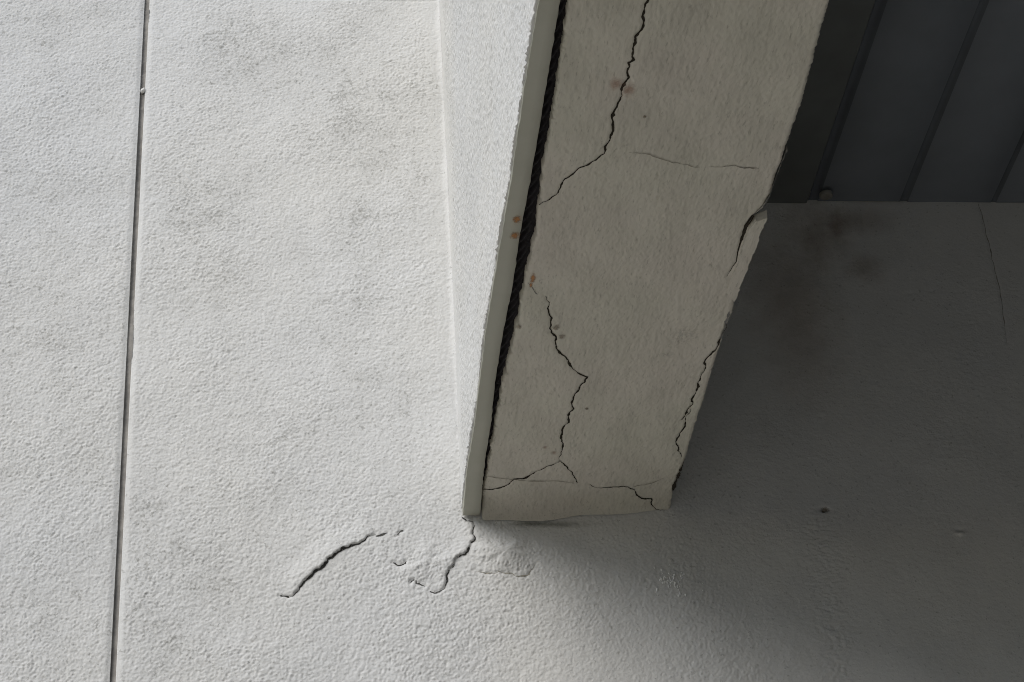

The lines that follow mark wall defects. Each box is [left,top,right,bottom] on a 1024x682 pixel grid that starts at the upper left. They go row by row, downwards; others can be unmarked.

crack [539,0,697,205]
crack [483,284,663,511]
crack [675,324,727,457]
crack [280,530,403,598]
crack [393,517,537,594]